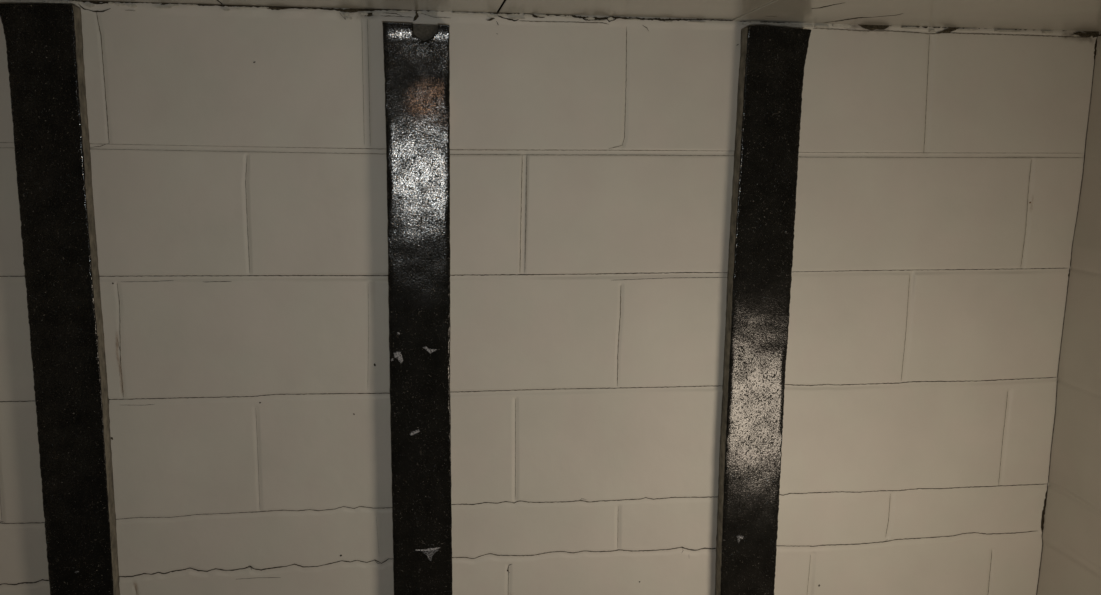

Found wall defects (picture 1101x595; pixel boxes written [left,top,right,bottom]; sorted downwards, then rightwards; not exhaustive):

crack [68,0,786,156]
crack [99,146,392,593]
crack [450,149,727,505]
crack [779,3,1101,592]
crack [0,578,49,586]
crack [452,547,716,584]